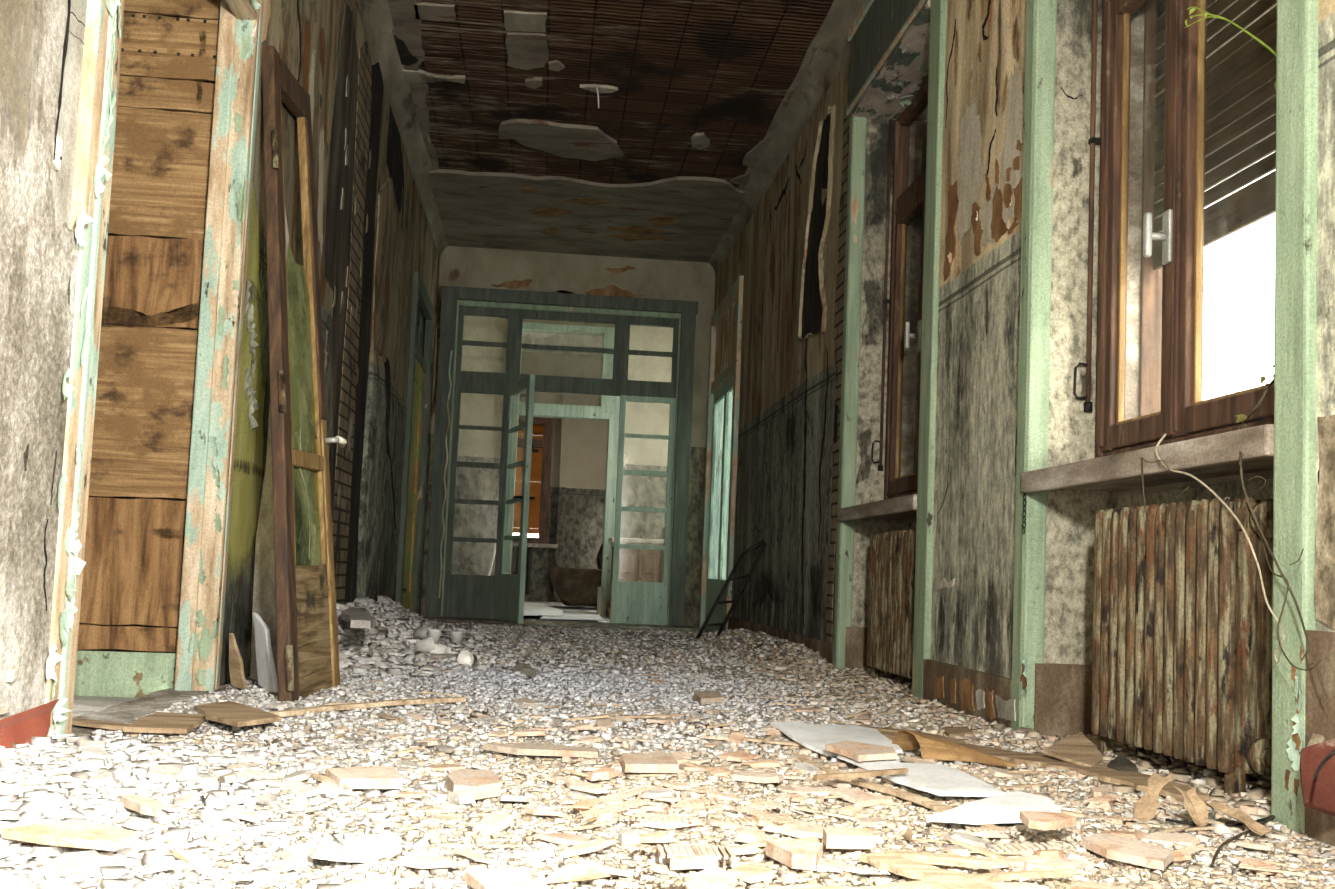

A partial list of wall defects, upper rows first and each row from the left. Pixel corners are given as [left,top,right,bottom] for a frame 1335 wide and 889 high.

water stain [0,0,43,162]
flaking render [49,0,94,246]
peeling [94,0,122,198]
peeling [943,64,1024,281]
peeling [62,272,91,400]
flaking render [798,103,850,642]
water stain [946,303,963,431]
peeling [46,473,86,737]
water stain [939,591,965,649]
water stain [987,583,1012,643]